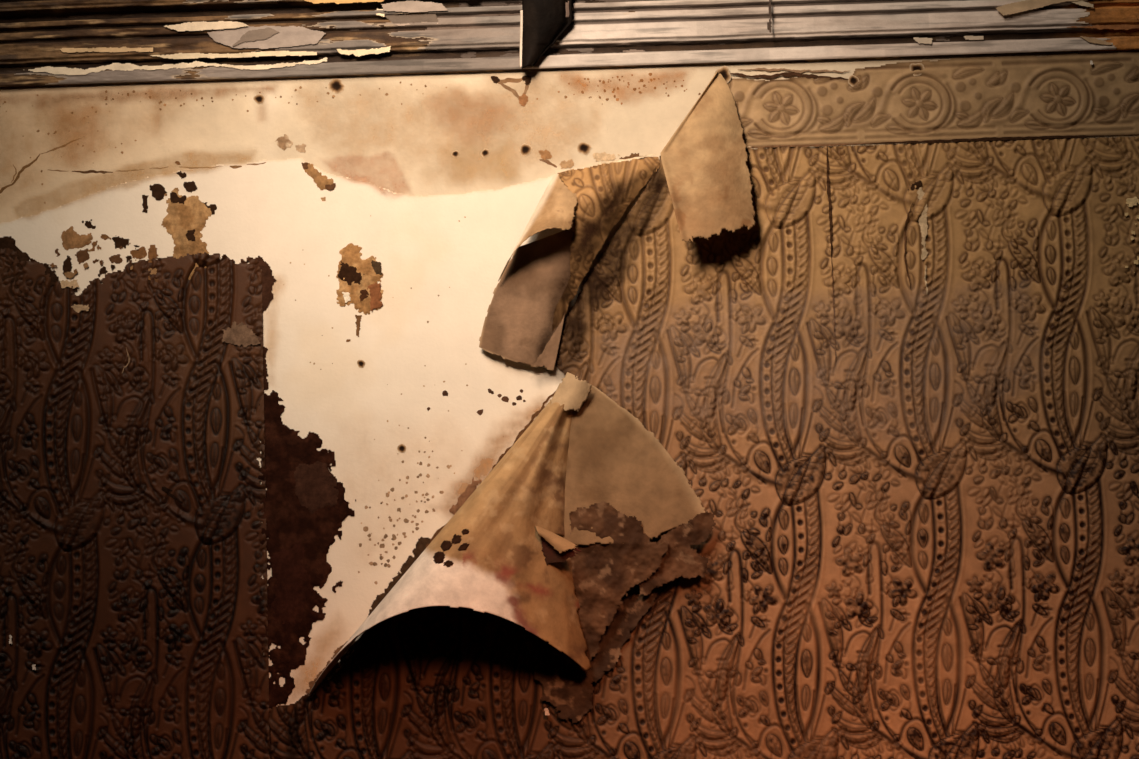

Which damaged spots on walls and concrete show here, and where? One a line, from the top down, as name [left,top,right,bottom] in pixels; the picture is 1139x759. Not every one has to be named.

peeling [305,0,447,26]
peeling [28,21,391,75]
peeling [142,161,217,214]
peeling [275,134,336,201]
peeling [49,219,159,289]
peeling [255,256,276,311]
peeling [367,260,383,311]
peeling [260,347,269,390]
peeling [294,461,339,514]